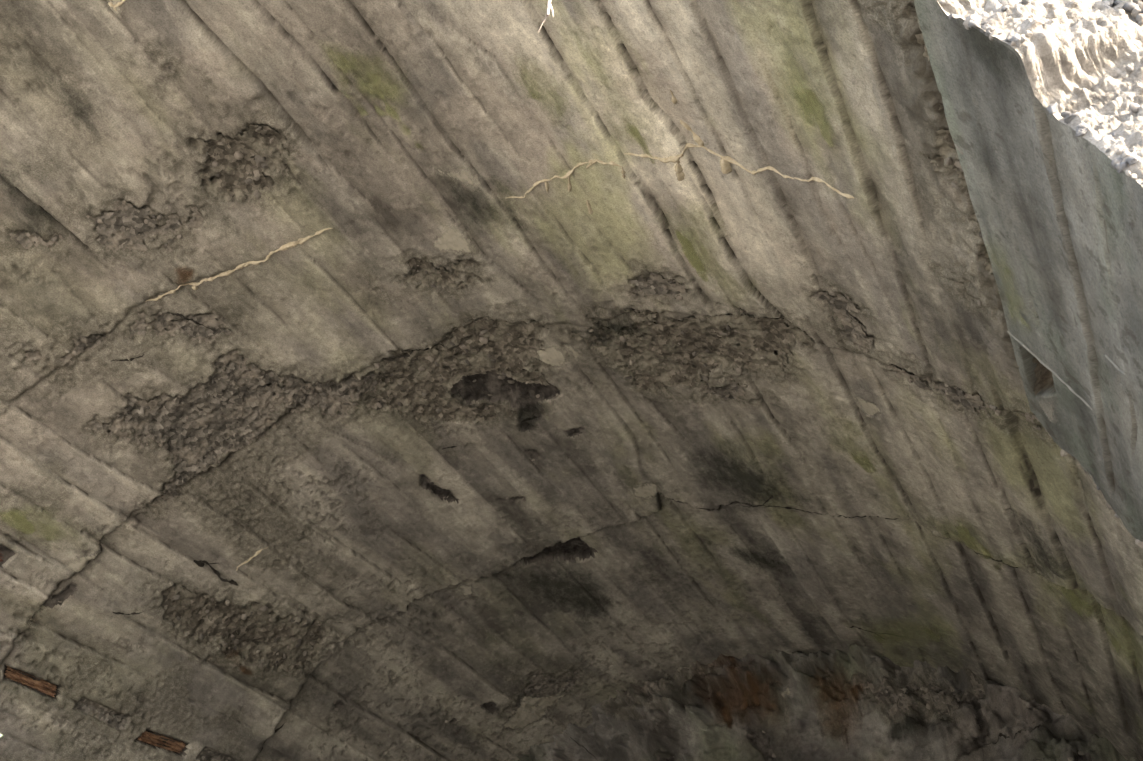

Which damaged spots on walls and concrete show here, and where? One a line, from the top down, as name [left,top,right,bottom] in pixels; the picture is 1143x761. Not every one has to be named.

spalling [938,0,1143,188]
spalling [189,124,289,203]
spalling [927,129,969,192]
spalling [404,258,484,290]
spalling [568,272,814,402]
spalling [85,312,560,504]
spalling [566,426,587,438]
crack [673,495,898,520]
spalling [514,537,598,565]
spalling [162,584,326,674]